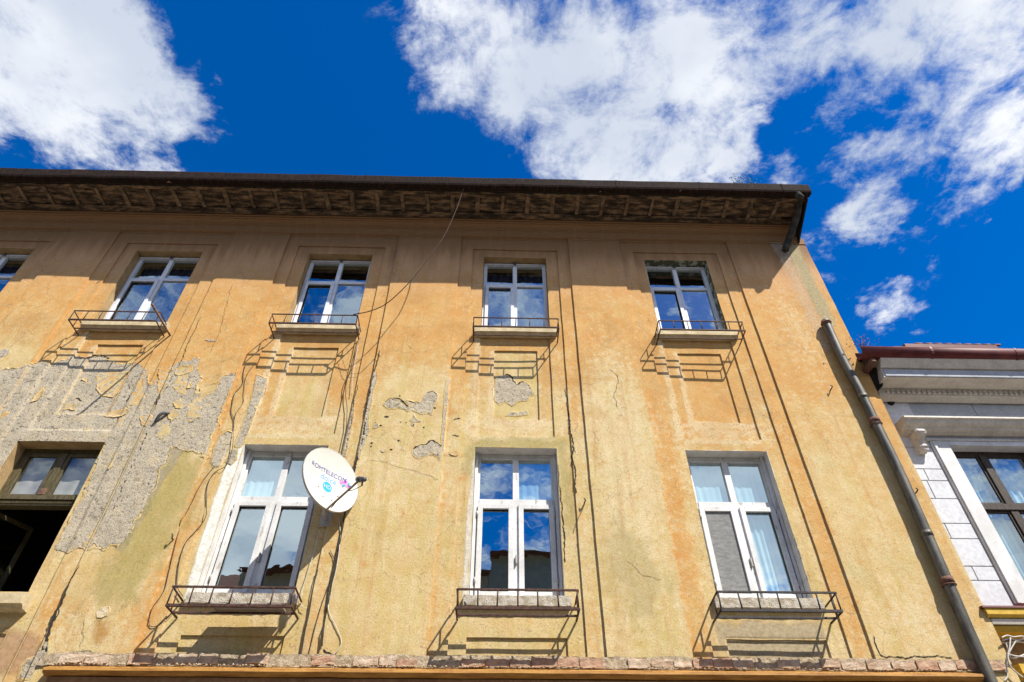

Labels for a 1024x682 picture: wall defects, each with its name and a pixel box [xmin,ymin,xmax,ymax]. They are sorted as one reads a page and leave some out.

peeling [0,348,269,554]
spalling [342,371,452,461]
peeling [493,374,536,417]